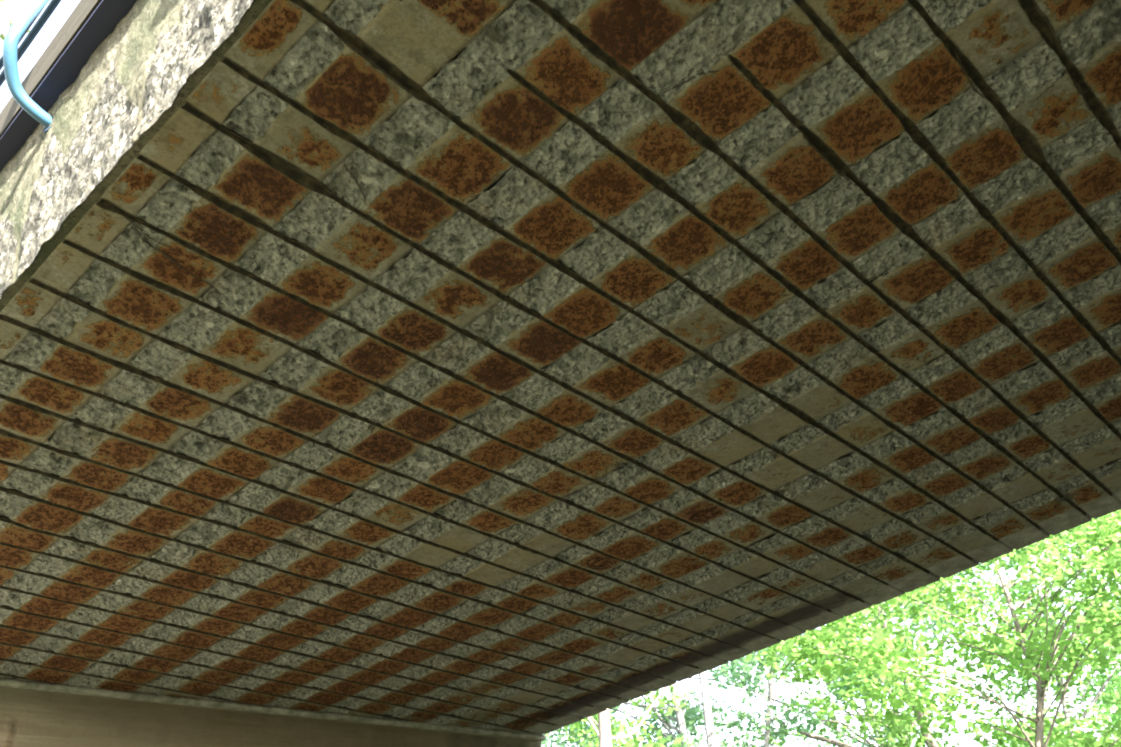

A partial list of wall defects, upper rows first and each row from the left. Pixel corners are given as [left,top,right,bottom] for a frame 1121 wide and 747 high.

corrosion [969,9,1029,64]
corrosion [0,0,972,684]
corrosion [467,128,1121,539]